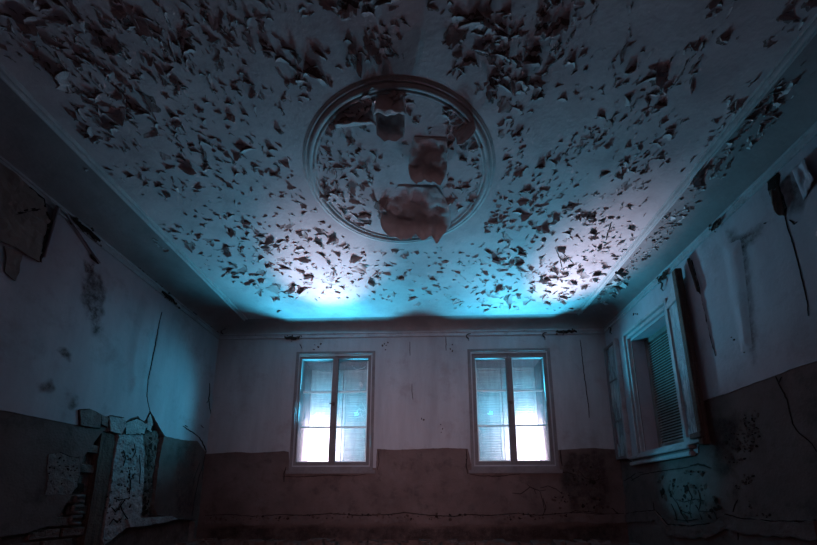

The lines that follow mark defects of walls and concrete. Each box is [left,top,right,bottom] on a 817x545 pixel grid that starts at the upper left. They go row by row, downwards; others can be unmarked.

peeling [0,0,817,313]
crack [784,216,809,316]
crack [183,383,211,455]
crack [775,376,817,452]
flaking render [99,434,177,545]